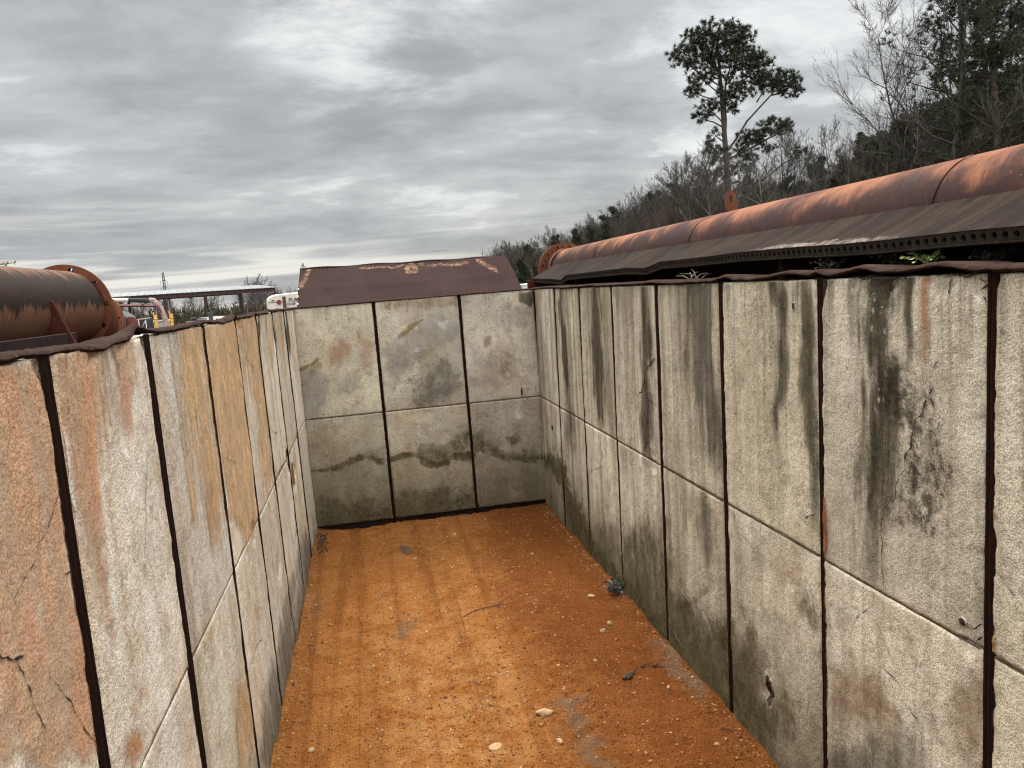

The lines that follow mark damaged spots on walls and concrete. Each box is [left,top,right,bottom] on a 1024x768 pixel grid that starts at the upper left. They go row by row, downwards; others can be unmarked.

rust [115,340,136,429]
rust [178,313,295,550]
water stain [591,288,605,420]
crack [589,358,656,471]
water stain [640,286,653,451]
water stain [768,281,818,513]
water stain [857,277,950,536]
crack [14,487,61,598]
rust [0,350,114,768]
crack [851,361,938,682]
crack [0,655,97,742]
spalling [764,670,775,712]